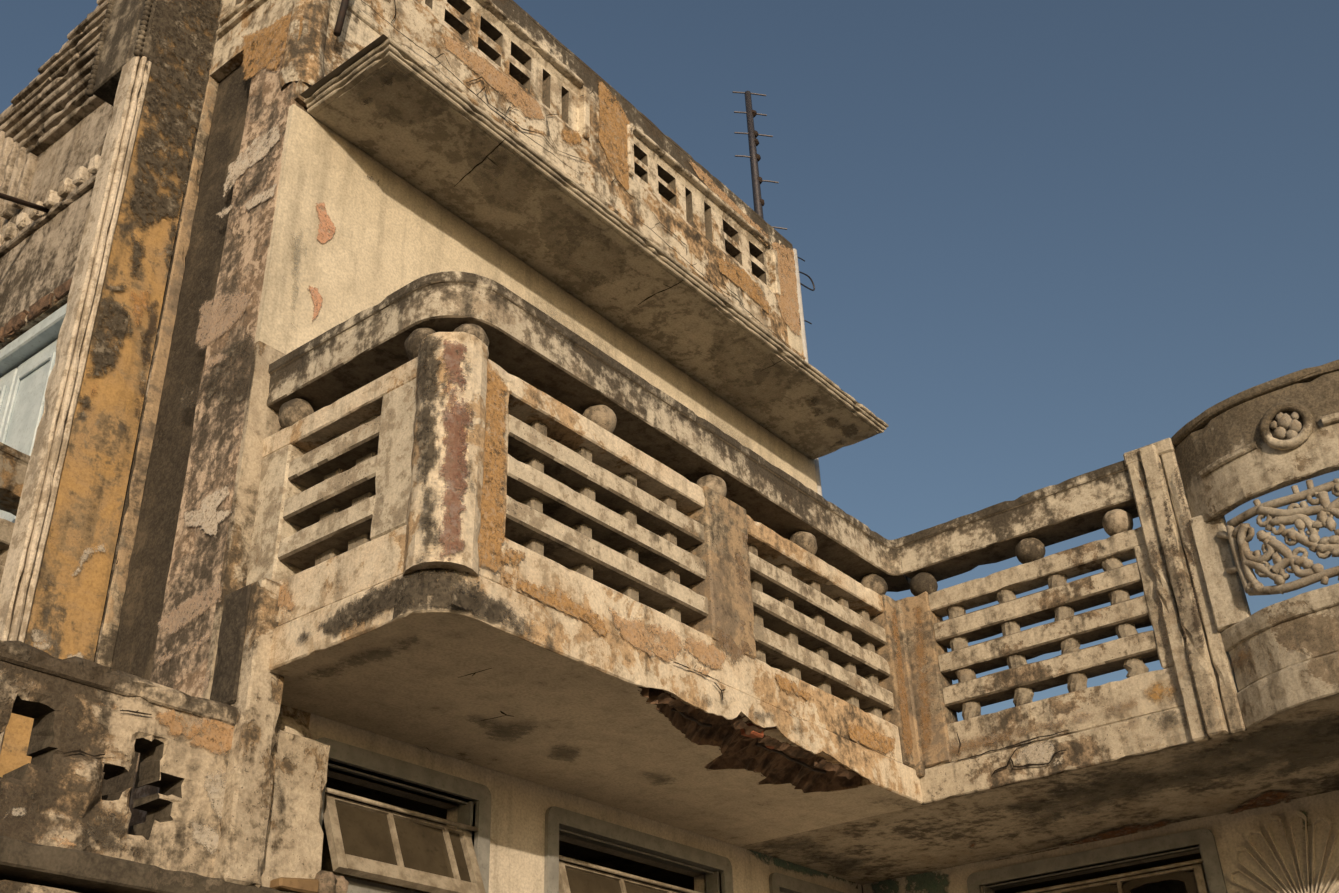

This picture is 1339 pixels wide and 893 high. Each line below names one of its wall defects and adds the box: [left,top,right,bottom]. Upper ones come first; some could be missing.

damp [87,0,222,419]
peeling [316,202,336,244]
crack [361,0,786,372]
peeling [562,81,630,191]
peeling [688,159,801,336]
peeling [307,286,323,322]
damp [77,394,91,417]
damp [181,333,255,425]
corrosion [437,340,476,559]
peeling [478,364,727,675]
spalling [638,686,870,793]
peeling [775,673,812,702]